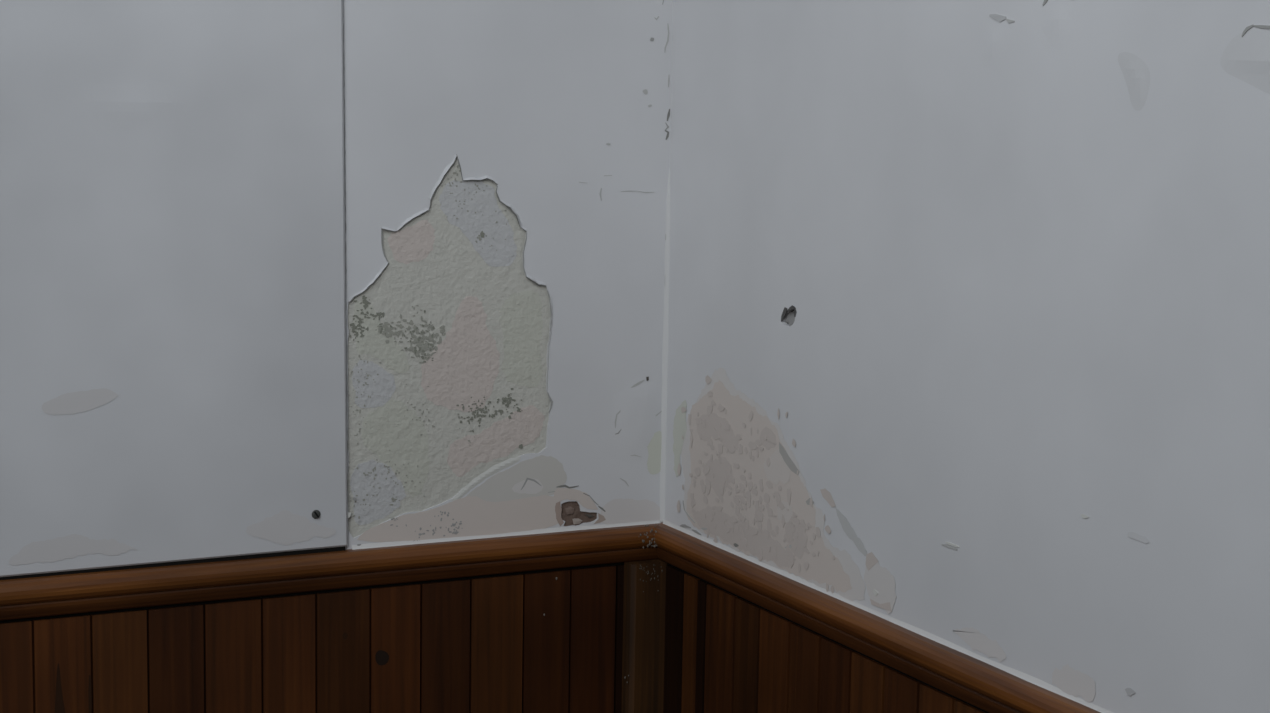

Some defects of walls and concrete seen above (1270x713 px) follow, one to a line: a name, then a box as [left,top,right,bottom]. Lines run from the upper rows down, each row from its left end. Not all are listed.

leakage [349,295,523,446]
peeling [347,155,553,546]
leakage [350,450,660,542]
hole [561,501,597,526]
leakage [647,368,897,614]